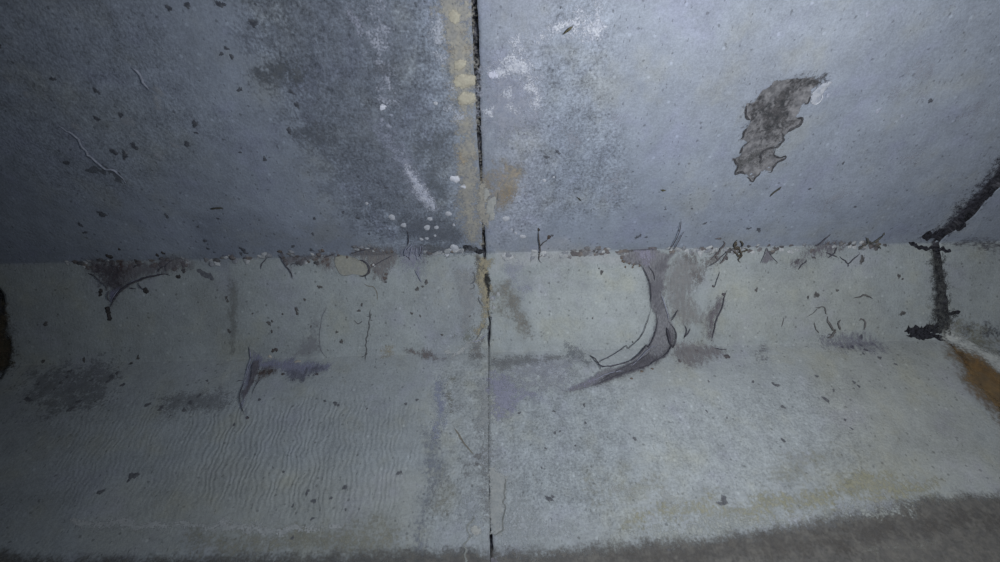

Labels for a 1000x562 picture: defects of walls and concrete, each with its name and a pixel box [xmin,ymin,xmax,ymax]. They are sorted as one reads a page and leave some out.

spalling [732,73,832,182]
crack [909,190,995,253]
crack [904,310,961,341]
corrosion [949,346,1000,417]
crack [496,477,506,535]